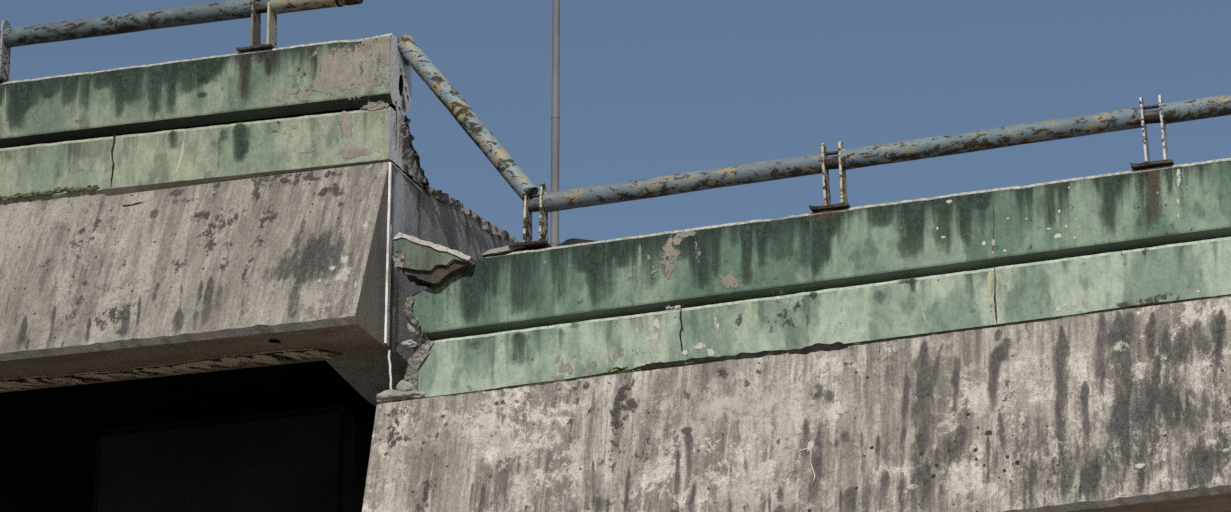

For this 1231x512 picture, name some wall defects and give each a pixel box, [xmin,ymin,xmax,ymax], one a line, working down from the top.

leakage [0,57,223,127]
peeling [277,36,391,161]
leakage [173,169,343,329]
spalling [404,291,480,399]
spalling [400,114,519,244]
leakage [592,376,662,509]
peeling [636,231,701,362]
leakage [553,211,839,297]
peeling [682,342,728,378]
crack [447,197,1231,396]
leakage [870,192,990,255]
leakage [836,293,1231,508]